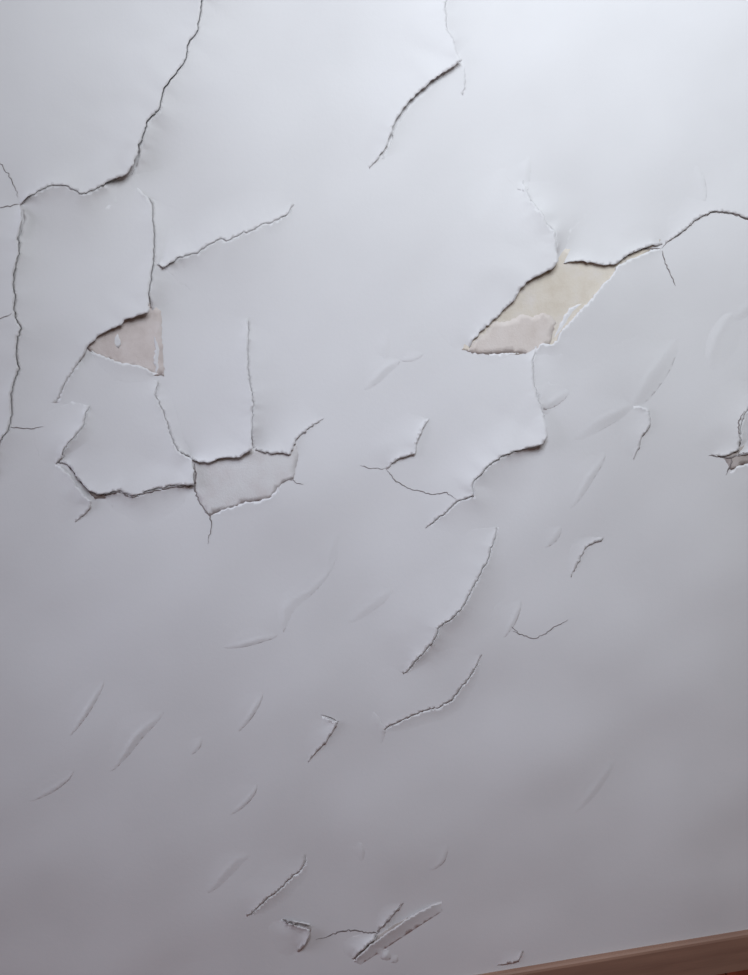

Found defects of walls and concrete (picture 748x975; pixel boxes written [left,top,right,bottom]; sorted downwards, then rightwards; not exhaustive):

peeling [343,0,492,169]
peeling [0,0,323,524]
peeling [364,168,669,744]
peeling [692,317,748,473]
peeling [303,715,338,762]
peeling [237,854,309,916]
peeling [269,919,312,956]
peeling [343,902,442,965]